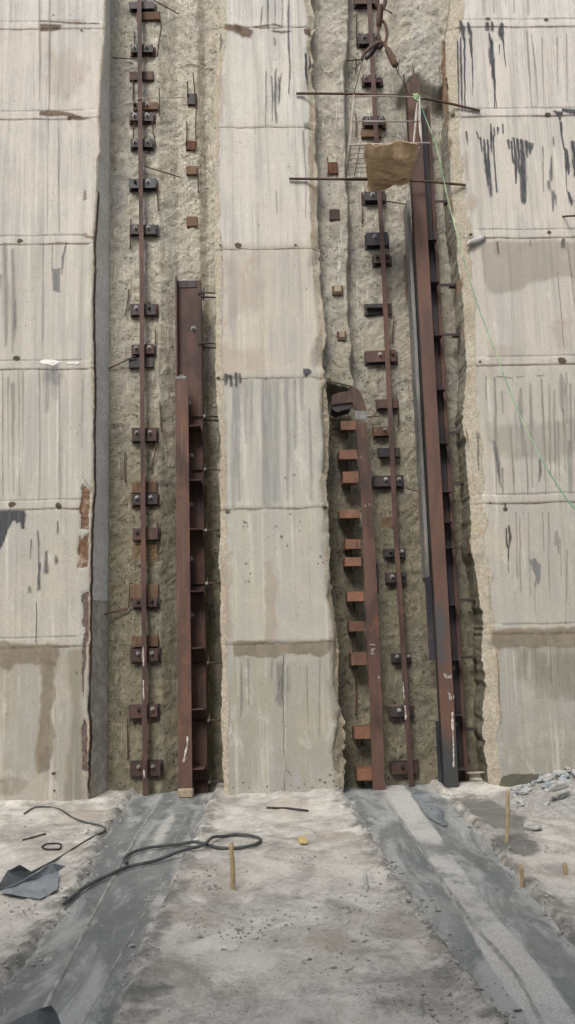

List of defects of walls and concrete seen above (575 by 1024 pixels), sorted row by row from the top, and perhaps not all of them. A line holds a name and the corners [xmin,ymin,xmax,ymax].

water stain [261,0,290,122]
water stain [457,20,473,110]
water stain [485,22,506,108]
water stain [466,107,575,209]
spalling [322,381,351,476]
water stain [493,440,506,508]
water stain [0,510,26,548]
water stain [530,559,540,586]
water stain [0,641,58,772]
spalling [327,582,357,776]